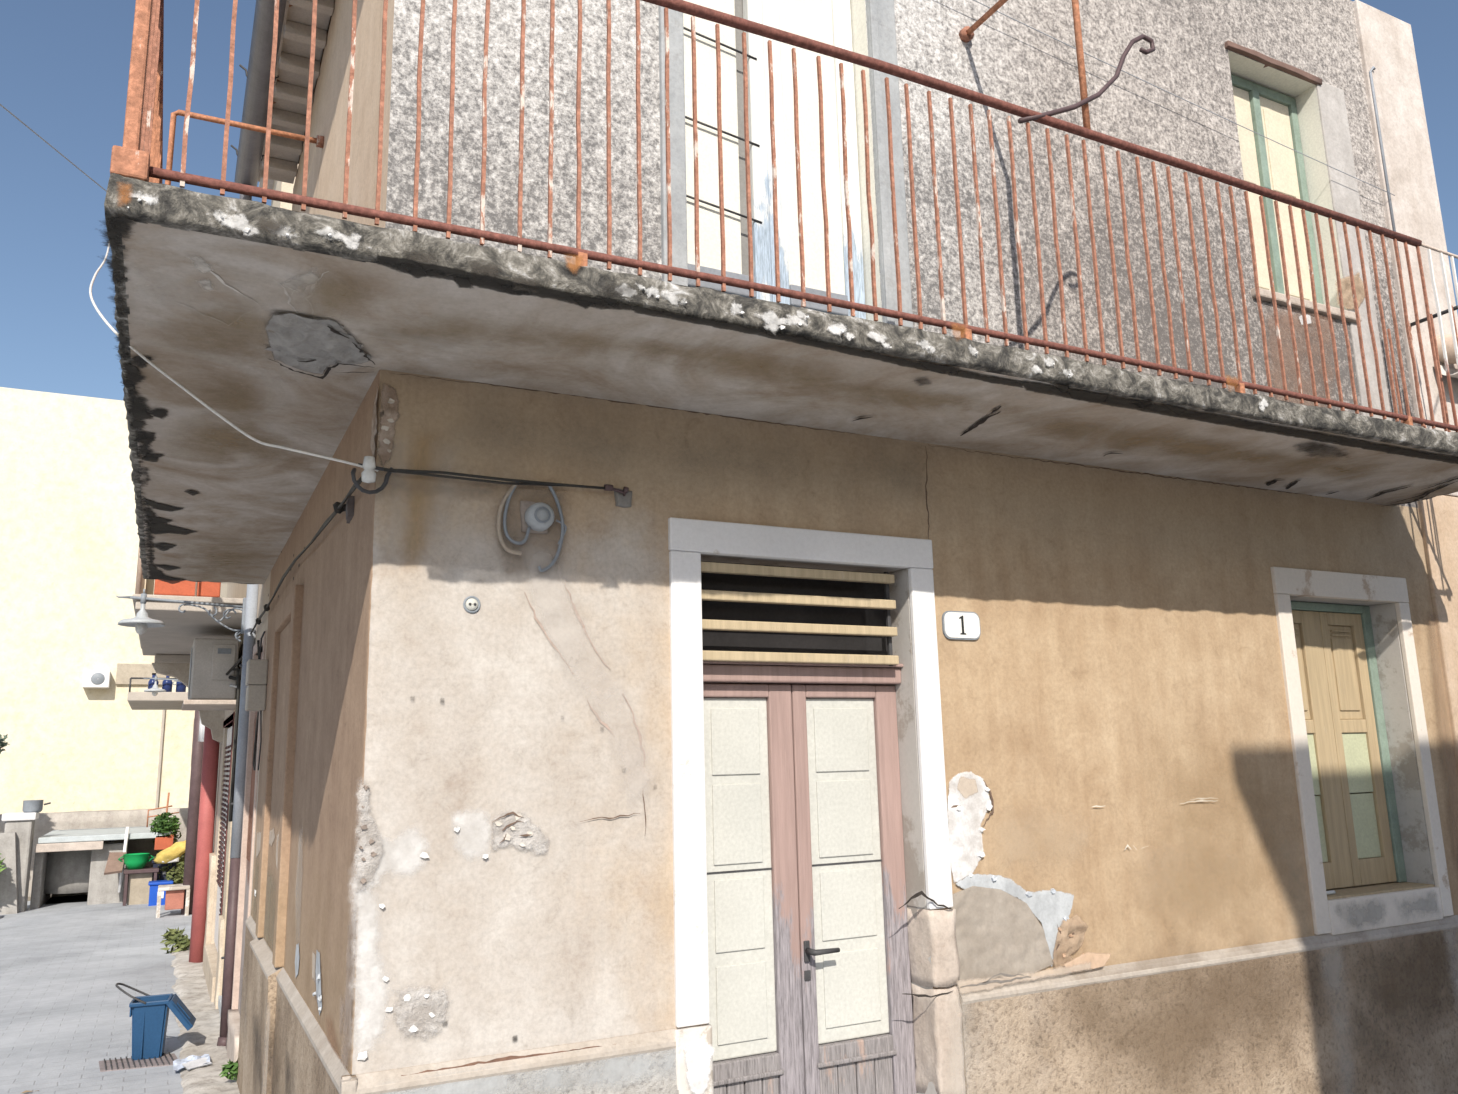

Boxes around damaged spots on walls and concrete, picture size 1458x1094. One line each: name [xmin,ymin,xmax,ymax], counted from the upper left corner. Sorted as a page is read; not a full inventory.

spalling [264,313,375,379]
leakage [102,214,200,584]
spalling [370,384,399,465]
peeling [247,807,279,896]
spalling [453,811,549,859]
crack [581,796,646,832]
peeling [948,772,1088,969]